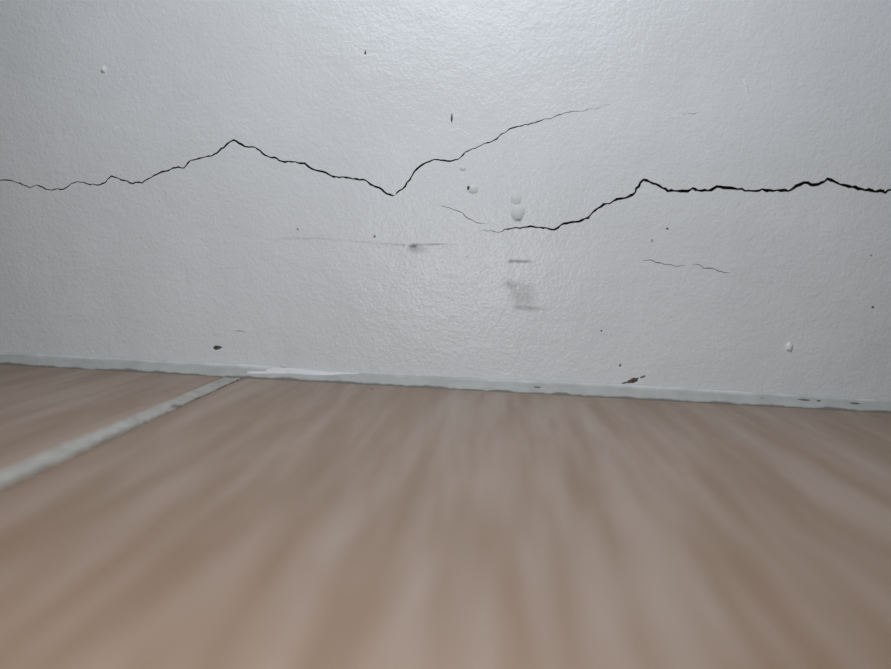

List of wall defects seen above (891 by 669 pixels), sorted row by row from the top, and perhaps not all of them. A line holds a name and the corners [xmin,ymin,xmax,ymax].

crack [1,104,609,196]
crack [440,177,891,232]